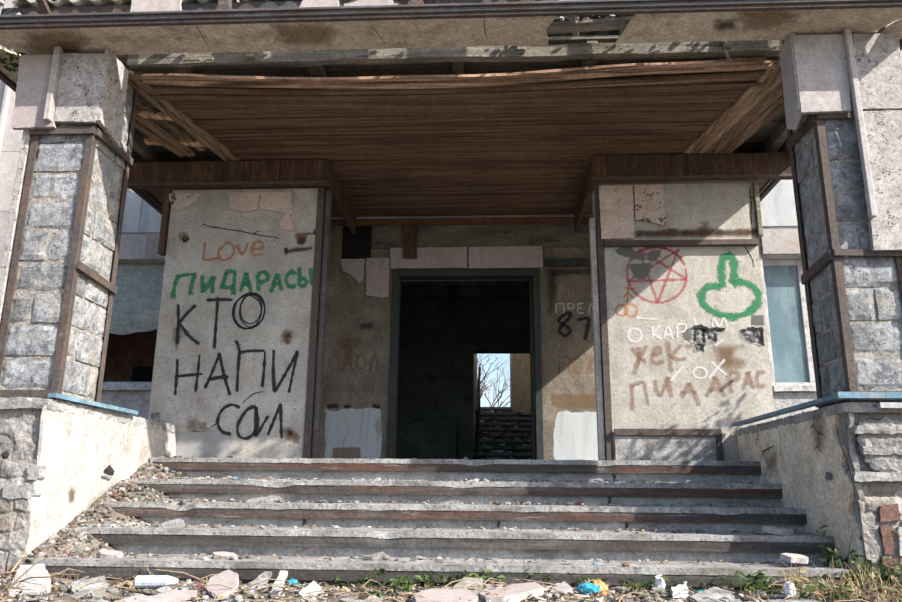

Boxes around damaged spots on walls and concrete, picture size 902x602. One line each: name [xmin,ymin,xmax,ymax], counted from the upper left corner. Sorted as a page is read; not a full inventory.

spalling [683,324,725,352]
spalling [739,315,765,346]